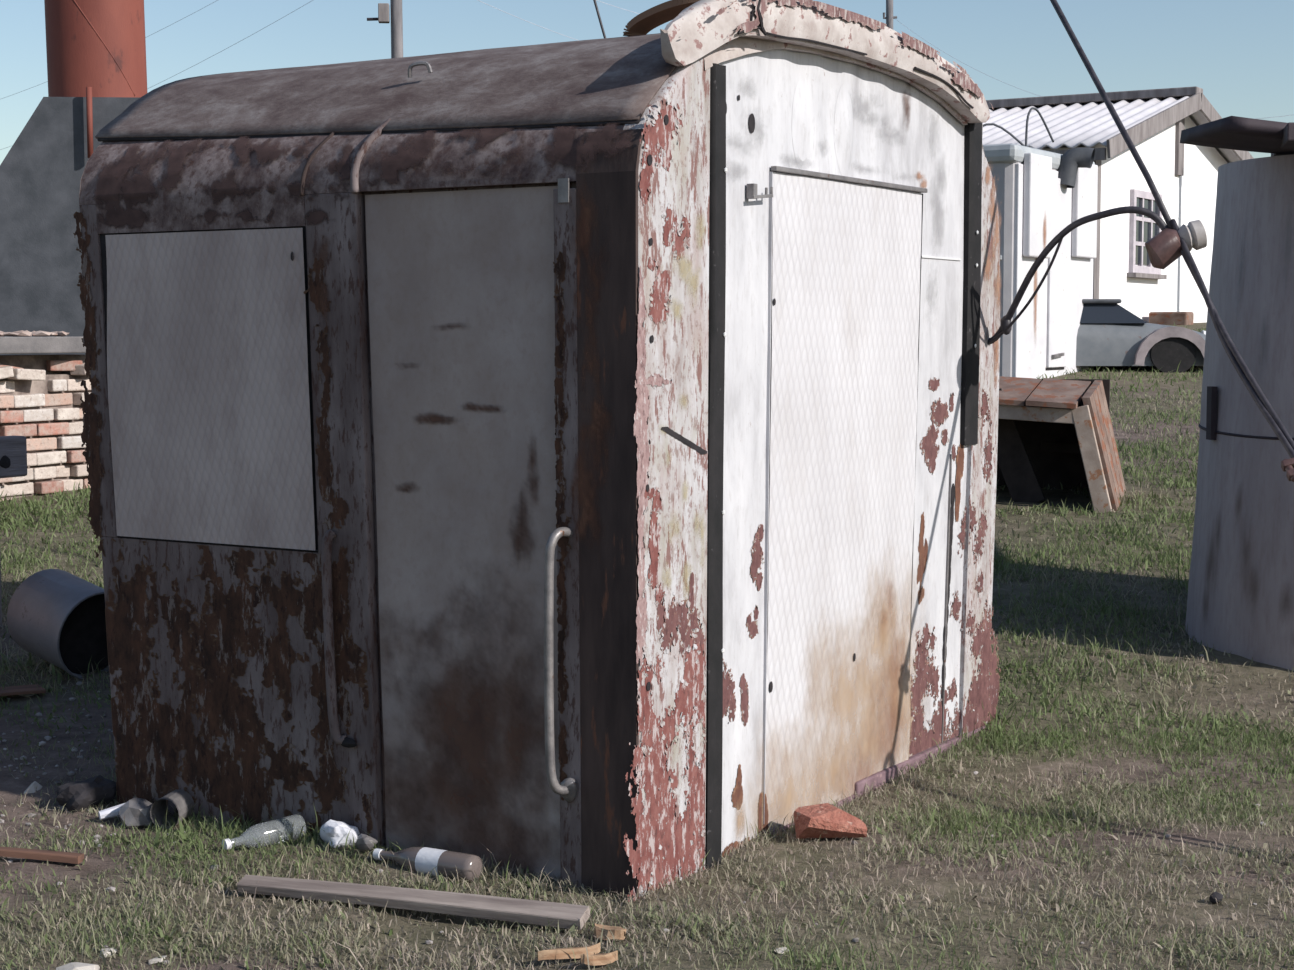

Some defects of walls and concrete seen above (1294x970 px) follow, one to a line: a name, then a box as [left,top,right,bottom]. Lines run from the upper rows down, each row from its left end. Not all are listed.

corrosion [367,127,524,186]
corrosion [544,123,632,171]
peeling [639,99,683,207]
peeling [920,377,956,473]
corrosion [73,135,369,836]
corrosion [514,454,537,553]
peeling [623,207,706,902]
peeling [747,524,764,639]
peeling [909,502,1001,755]
corrosion [355,661,545,874]
peeling [723,659,749,726]
corrosion [722,600,914,857]